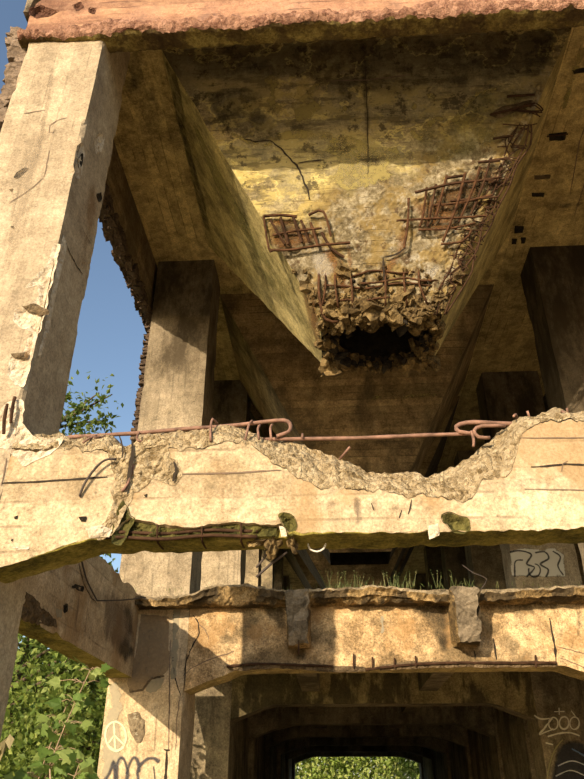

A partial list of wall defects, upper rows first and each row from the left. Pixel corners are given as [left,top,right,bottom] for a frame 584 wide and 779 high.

damp [287,32,552,98]
crack [245,139,321,199]
spalling [206,72,548,378]
spalling [7,233,67,387]
spalling [0,396,584,550]
crack [523,434,584,442]
crack [531,461,584,491]
crack [164,615,233,779]